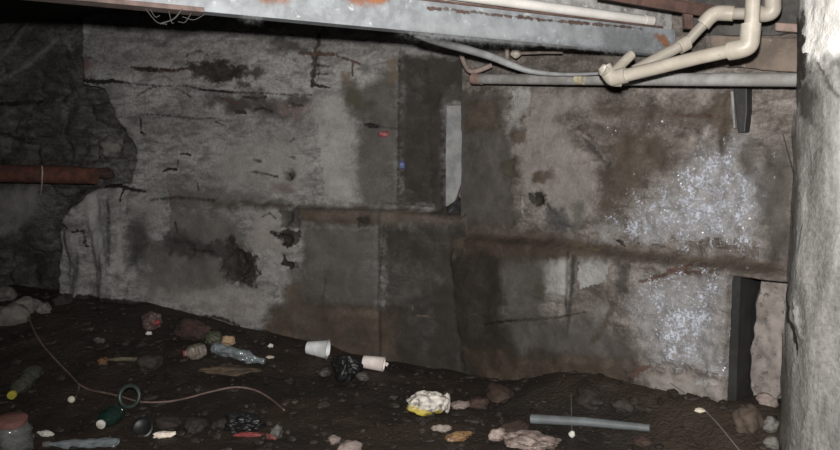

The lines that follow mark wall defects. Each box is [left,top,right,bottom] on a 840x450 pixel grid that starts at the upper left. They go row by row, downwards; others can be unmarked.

corrosion [427,6,642,30]
crack [83,79,154,93]
crack [183,85,284,97]
crack [309,33,330,96]
peeling [0,182,51,249]
leakage [62,54,840,384]
peeling [126,196,307,330]
crack [784,286,805,355]
leakage [778,335,789,449]